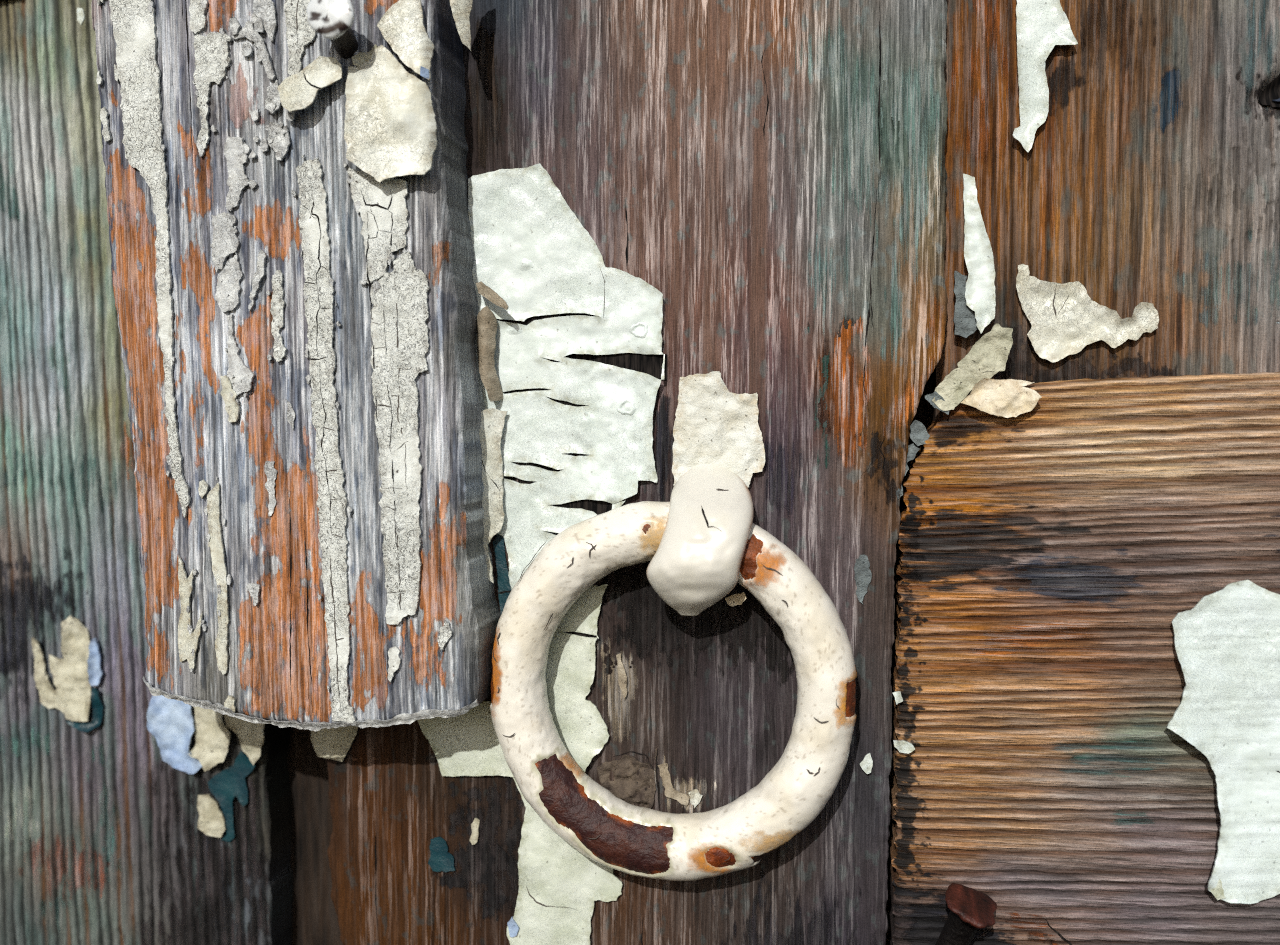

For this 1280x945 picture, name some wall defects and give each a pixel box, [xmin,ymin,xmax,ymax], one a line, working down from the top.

peeling [1012,0,1078,153]
peeling [925,174,1159,415]
peeling [468,163,766,614]
peeling [77,0,623,945]
rust [725,534,784,606]
peeling [31,615,104,732]
peeling [546,584,638,772]
rust [535,752,674,874]
peeling [654,756,716,813]
rust [691,833,795,873]
peeling [1166,580,1280,904]